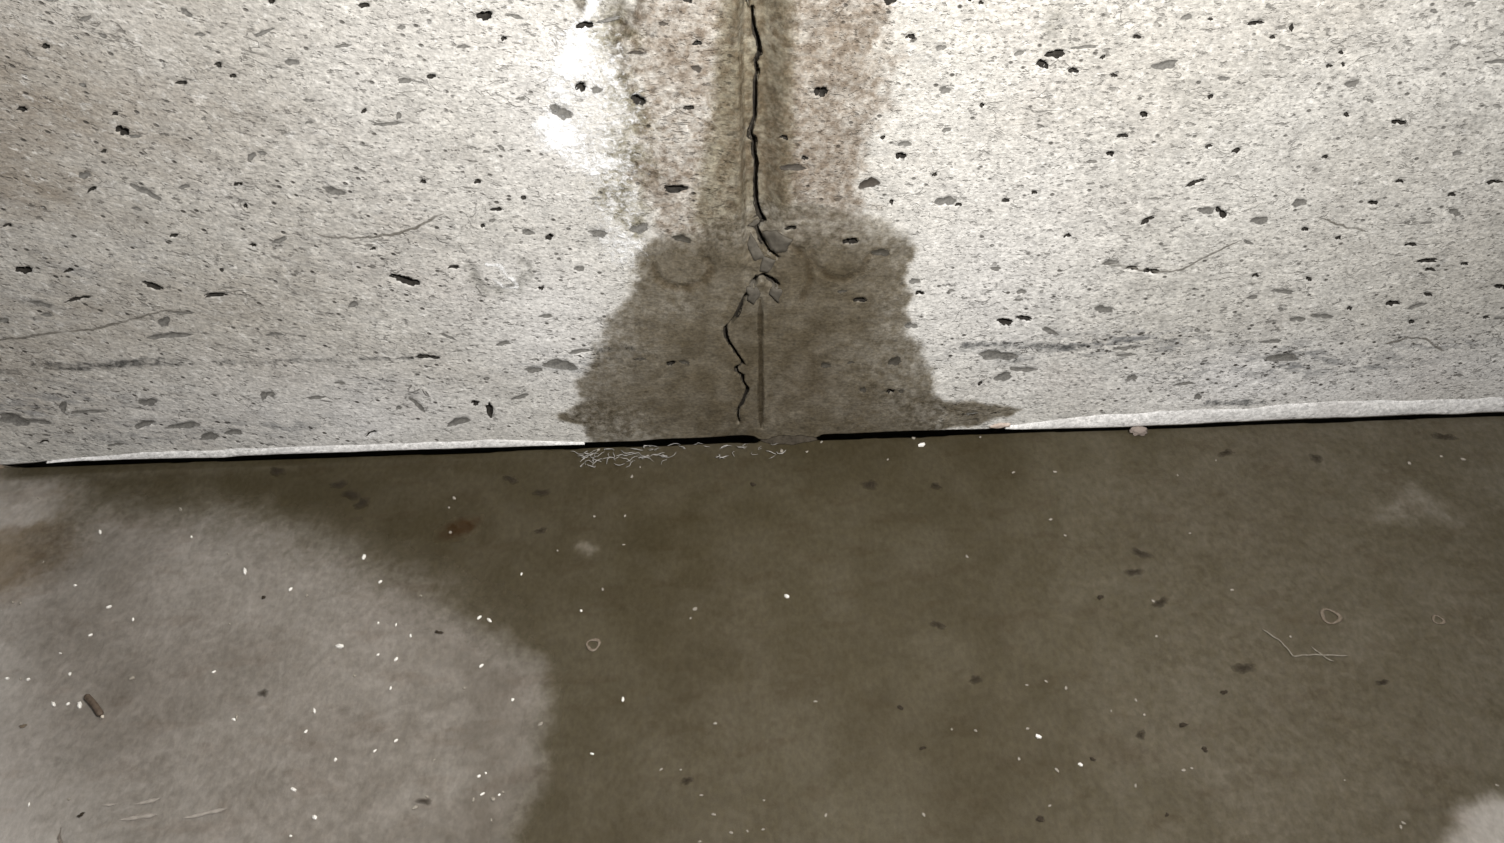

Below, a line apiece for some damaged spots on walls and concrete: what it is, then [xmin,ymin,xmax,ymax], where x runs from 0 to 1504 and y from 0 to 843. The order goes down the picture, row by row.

water stain [531,0,641,262]
crack [745,0,768,246]
crack [723,295,749,417]
water stain [8,224,1504,843]